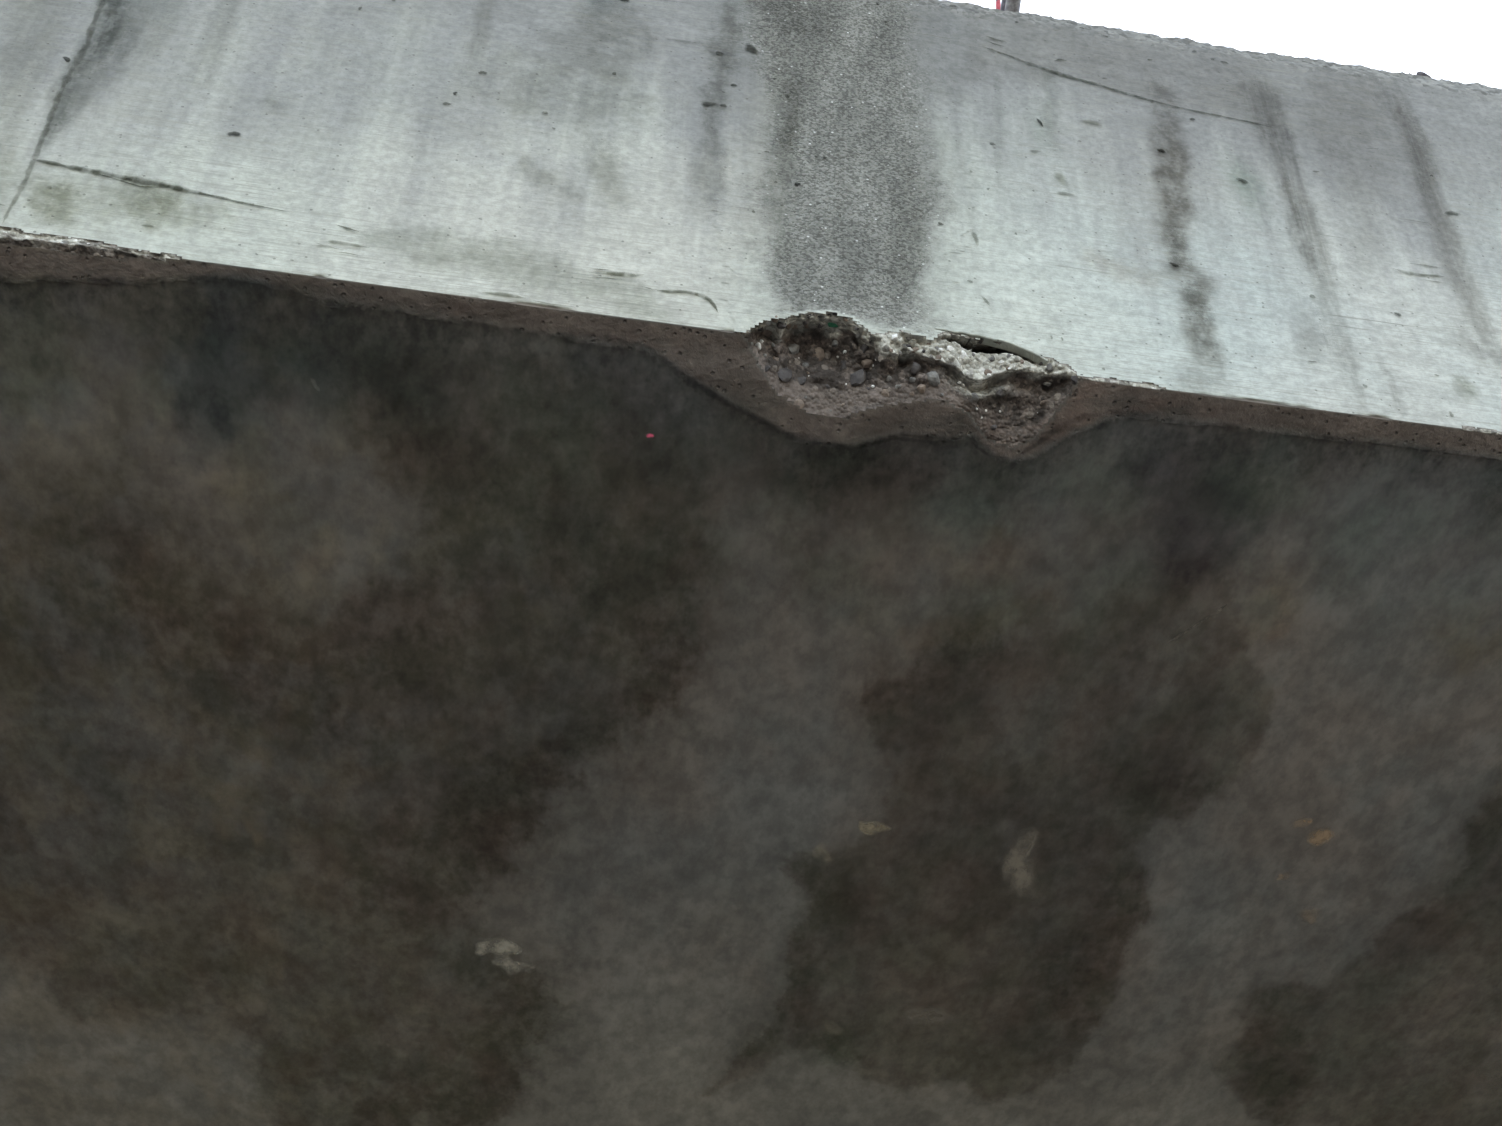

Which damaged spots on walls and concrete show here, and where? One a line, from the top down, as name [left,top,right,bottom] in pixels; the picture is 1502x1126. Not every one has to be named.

crack [33,159,283,211]
spalling [709,0,1166,448]